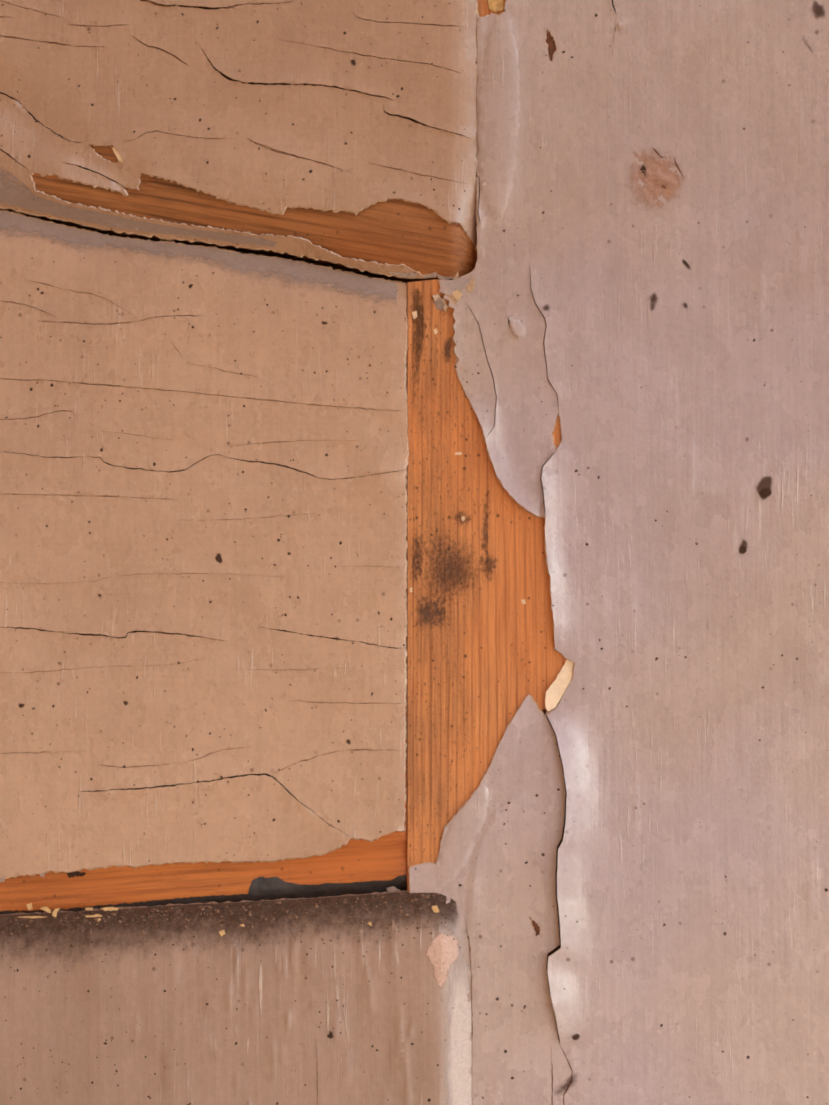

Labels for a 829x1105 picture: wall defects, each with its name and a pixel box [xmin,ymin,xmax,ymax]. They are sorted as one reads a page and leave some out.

peeling [477,0,506,18]
crack [0,0,466,137]
crack [0,92,120,185]
peeling [635,148,685,200]
crack [0,280,397,411]
crack [0,431,398,500]
peeling [0,173,575,915]
damp [413,493,496,623]
crack [1,627,224,673]
crack [2,747,397,828]
crack [543,709,573,1105]
peeling [426,933,459,988]